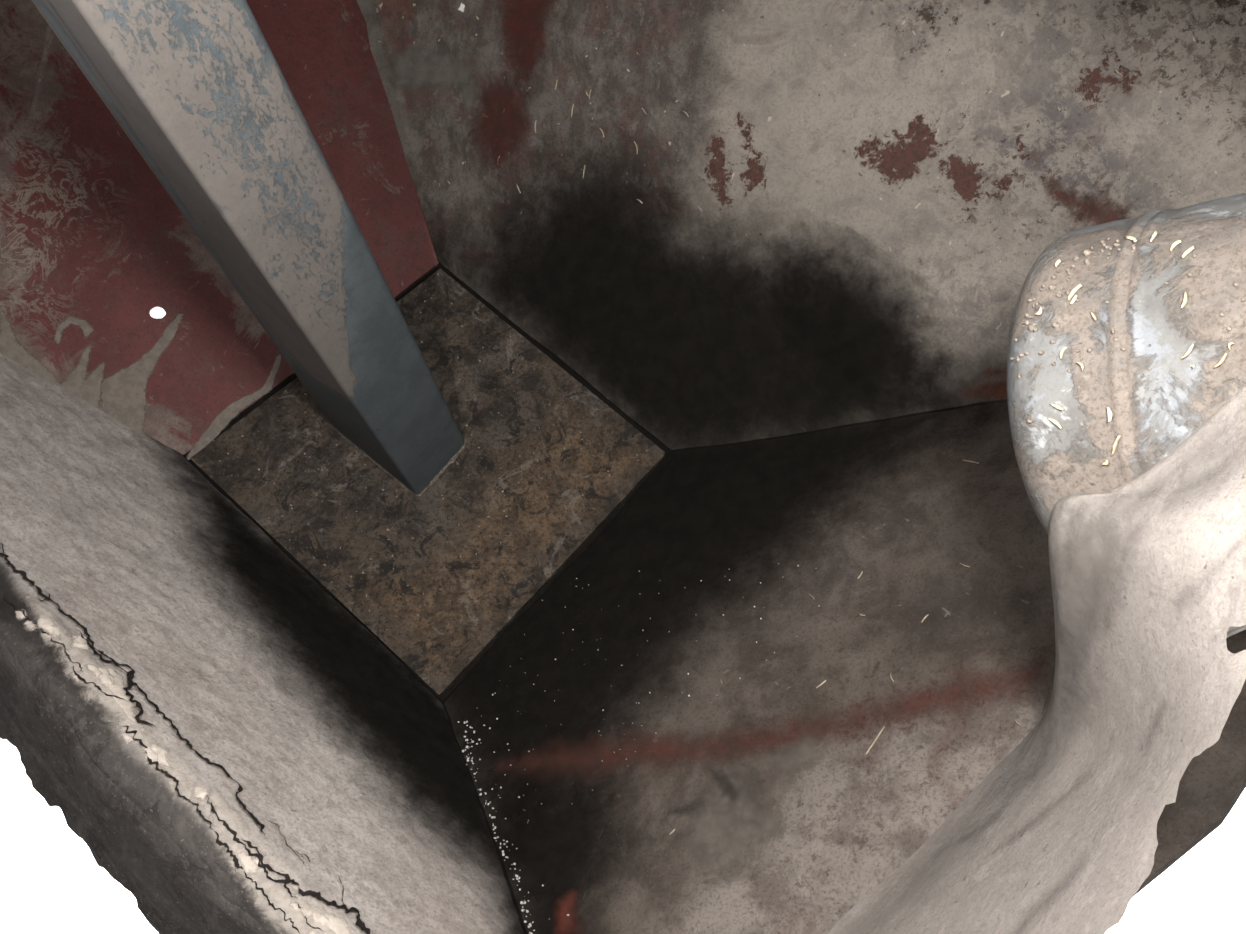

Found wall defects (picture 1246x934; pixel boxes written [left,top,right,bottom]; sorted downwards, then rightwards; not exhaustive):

crack [0,543,370,934]
water stain [169,162,984,934]
rust [972,370,1007,398]
rust [1047,179,1126,225]